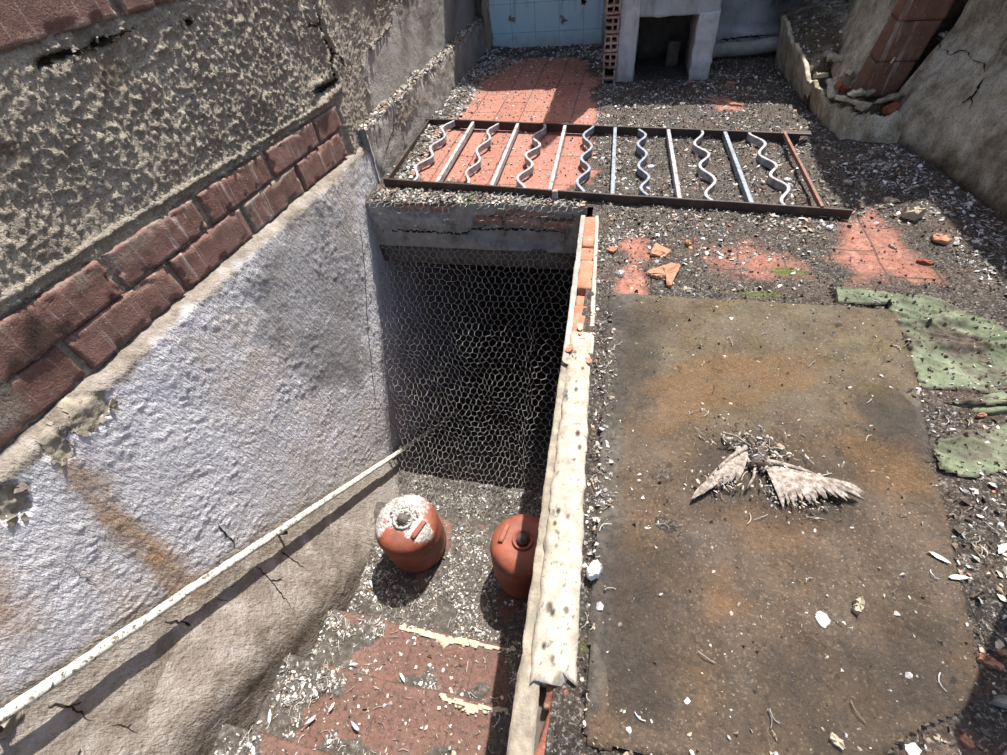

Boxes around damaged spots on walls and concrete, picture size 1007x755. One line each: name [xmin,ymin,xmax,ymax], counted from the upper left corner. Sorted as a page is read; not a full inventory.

crack [34,27,146,67]
crack [304,0,425,94]
crack [961,77,985,106]